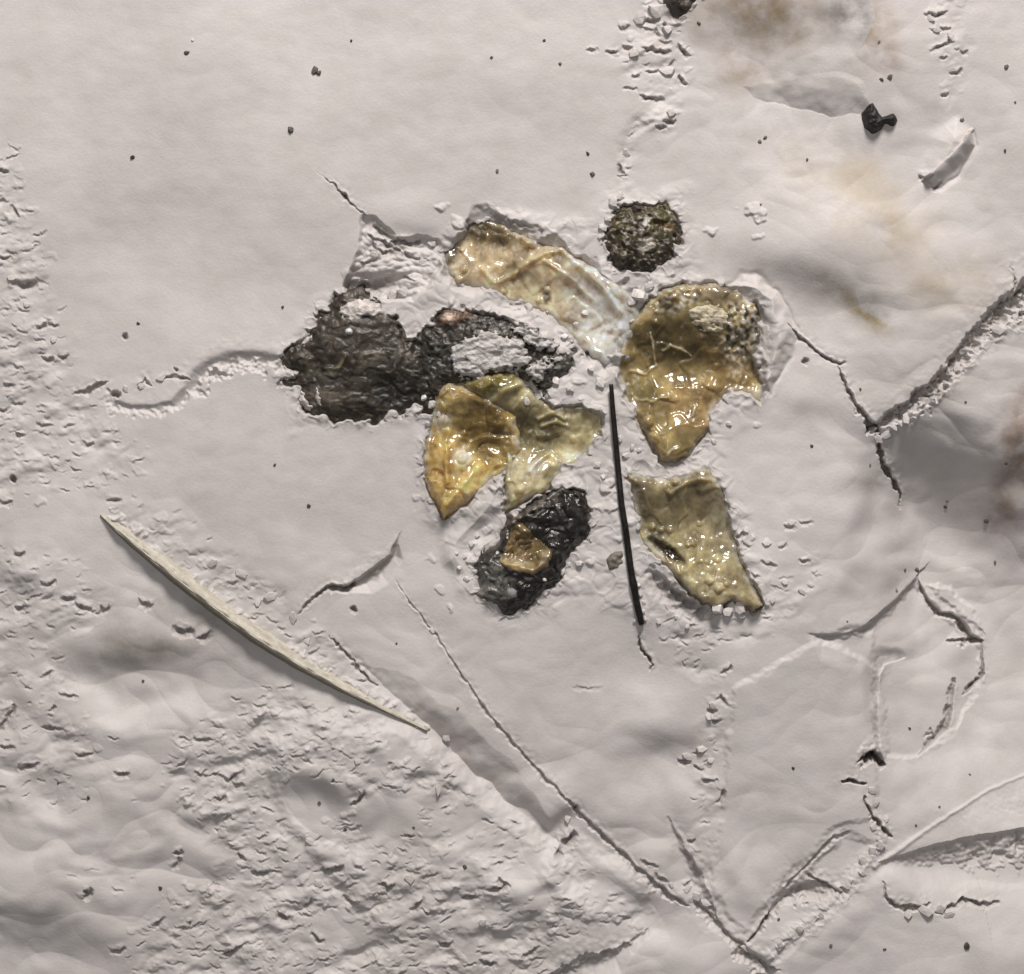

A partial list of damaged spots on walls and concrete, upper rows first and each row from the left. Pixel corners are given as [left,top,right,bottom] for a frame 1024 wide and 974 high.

crack [324,177,366,215]
crack [787,267,1024,510]
spalling [0,146,661,974]
crack [298,531,1001,974]
spalling [664,556,829,856]